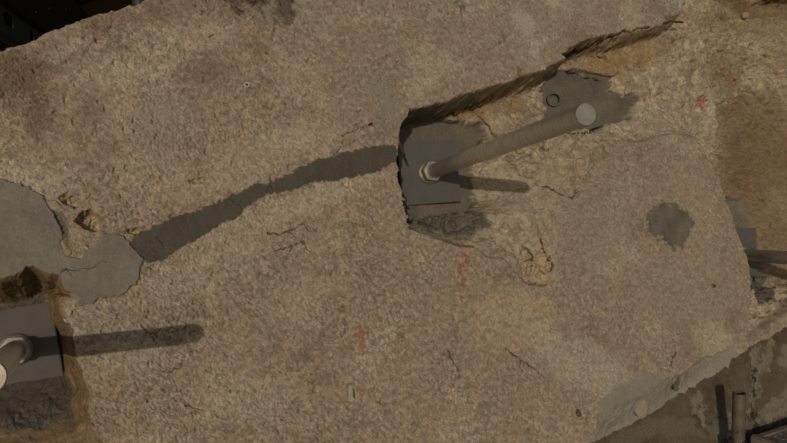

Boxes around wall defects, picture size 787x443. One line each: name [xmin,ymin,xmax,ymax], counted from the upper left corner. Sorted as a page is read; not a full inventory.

crack [562,27,654,81]
spalling [405,0,787,290]
spalling [58,193,104,233]
crack [267,223,311,252]
spalling [746,263,787,346]
spalling [0,267,104,443]